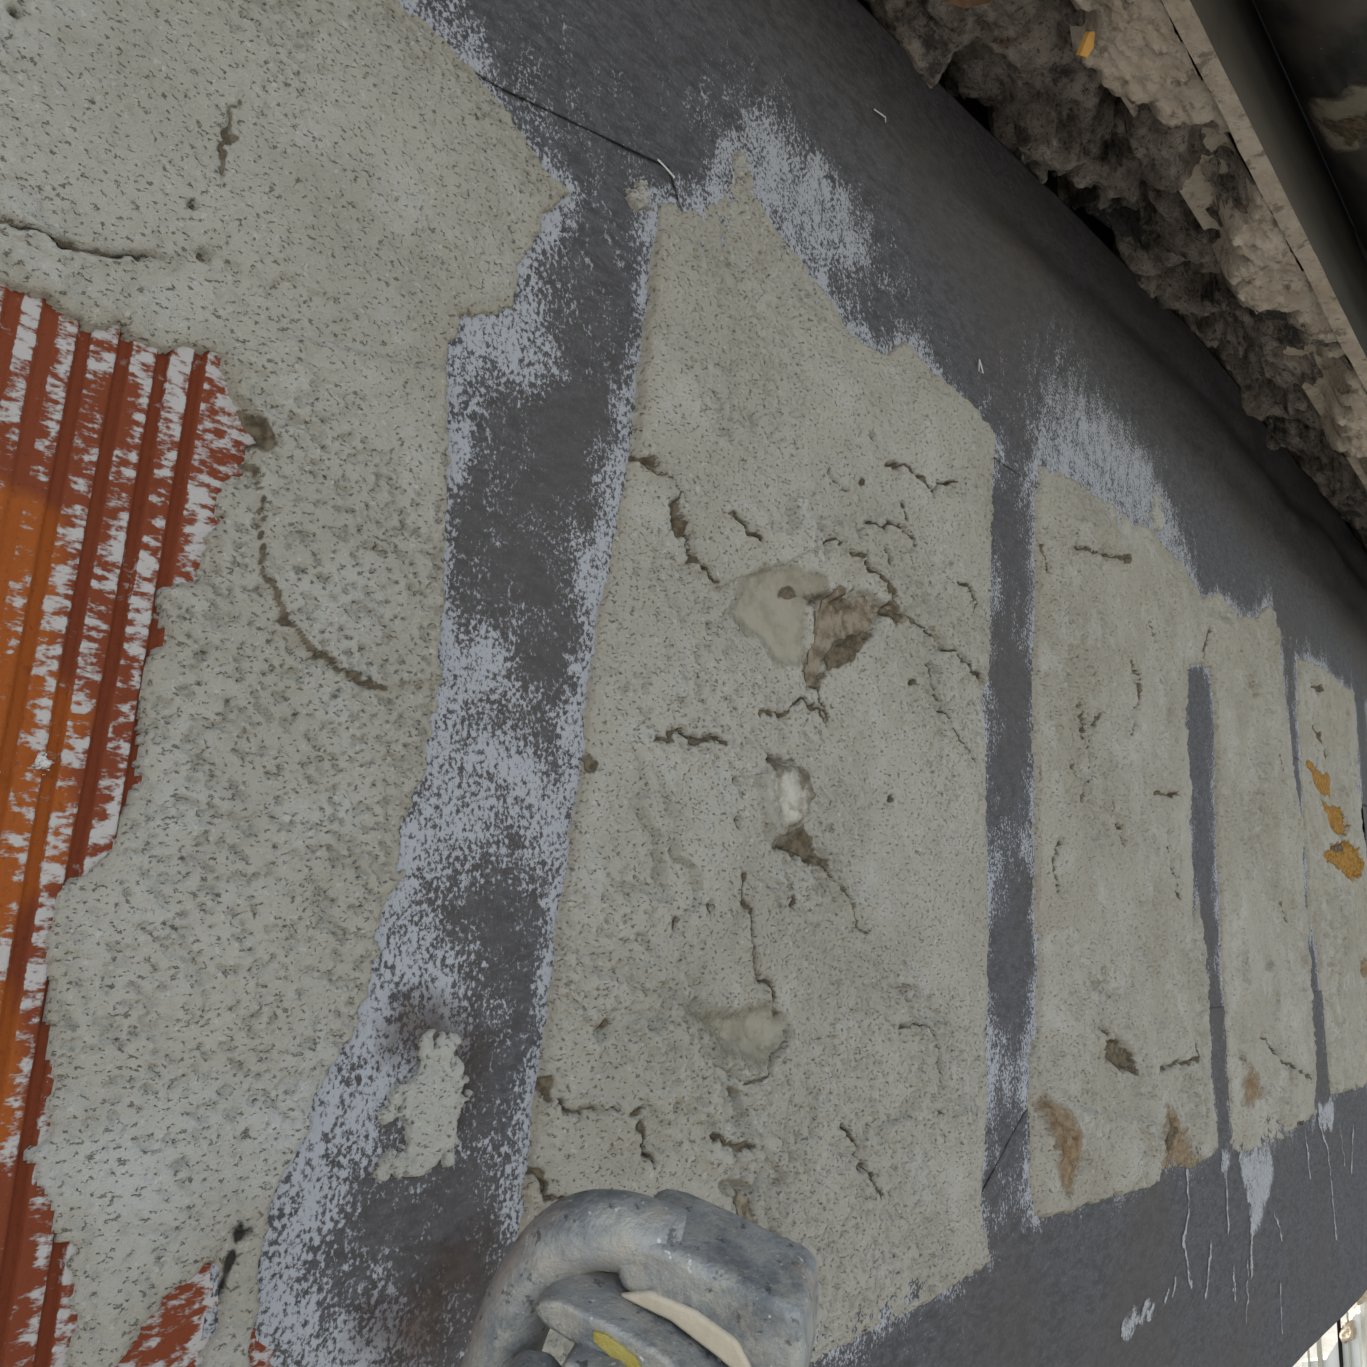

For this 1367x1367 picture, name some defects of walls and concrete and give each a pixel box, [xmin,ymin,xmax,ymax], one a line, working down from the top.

spalling [778,585,908,687]
spalling [583,754,598,773]
damp [399,1006,470,1091]
damp [381,1252,473,1357]